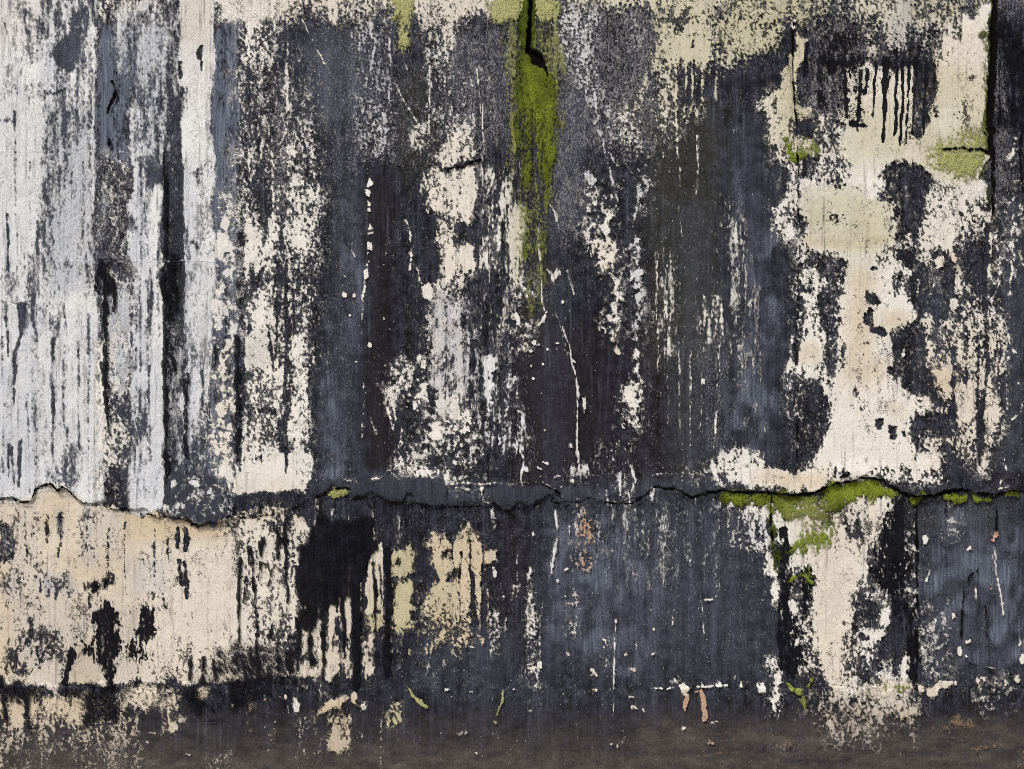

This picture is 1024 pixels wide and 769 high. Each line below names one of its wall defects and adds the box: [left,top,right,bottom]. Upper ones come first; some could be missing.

crack [525,0,548,75]
damp [802,23,938,146]
crack [942,0,998,258]
damp [989,14,1024,191]
damp [537,229,547,326]
peeling [551,0,1024,493]
spalling [0,0,559,769]
crack [0,482,208,526]
crack [315,326,1018,691]
damp [715,491,1022,704]
peeling [804,522,971,750]
peeling [971,641,1024,714]